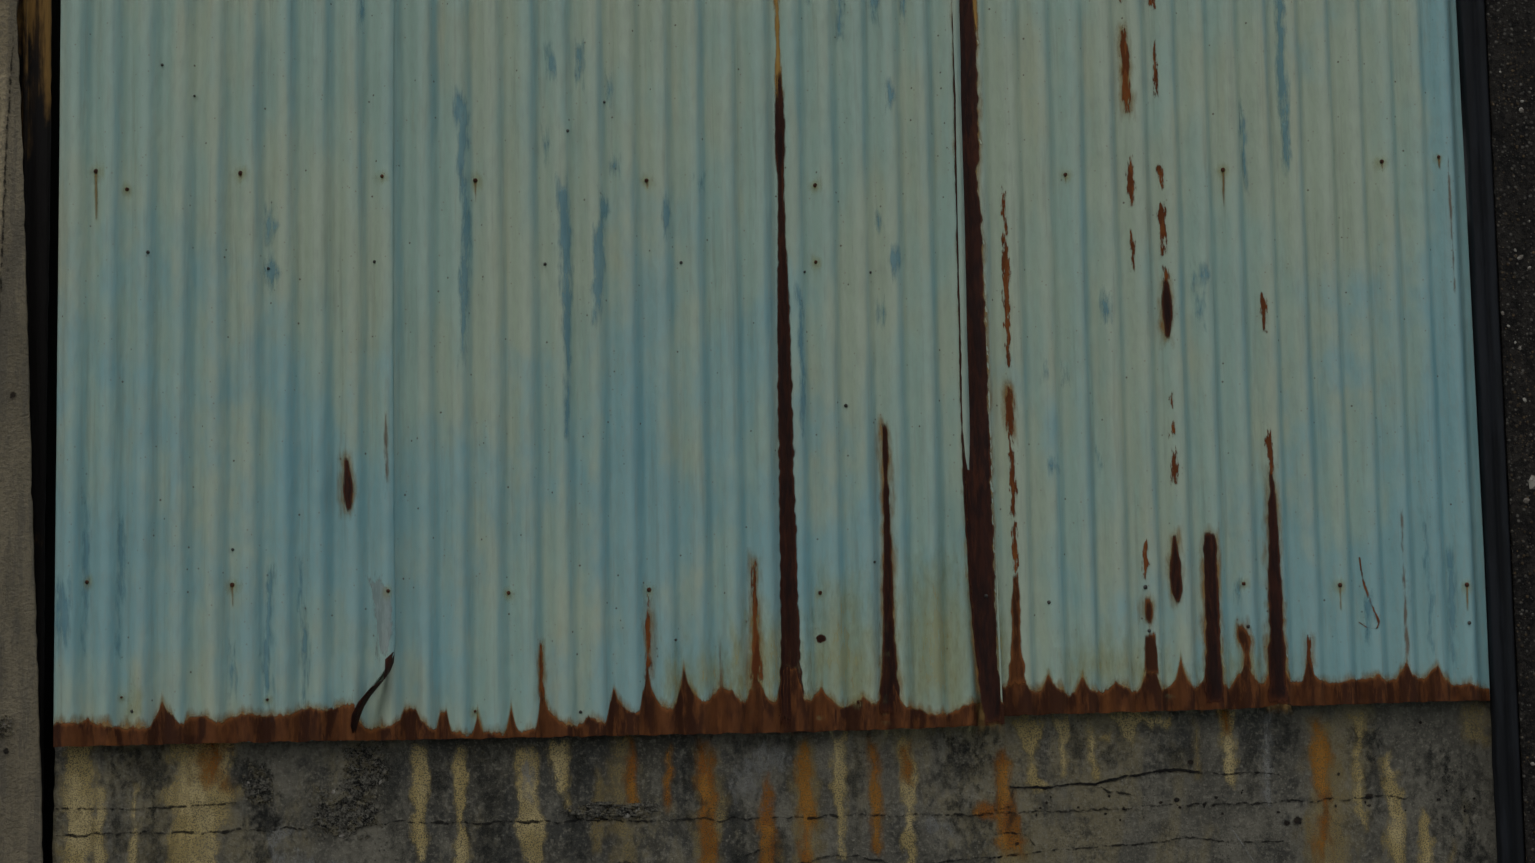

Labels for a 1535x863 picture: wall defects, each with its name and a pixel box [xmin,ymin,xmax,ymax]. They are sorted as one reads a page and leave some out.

rust [1001,188,1011,367]
rust [1156,165,1173,337]
rust [773,0,804,725]
rust [953,0,1001,724]
rust [53,423,1490,808]
leakage [55,742,314,863]
crack [56,803,326,838]
leakage [384,740,608,863]
leakage [828,731,861,859]
crack [368,768,1407,863]
leakage [1012,711,1171,792]
leakage [1347,711,1483,863]